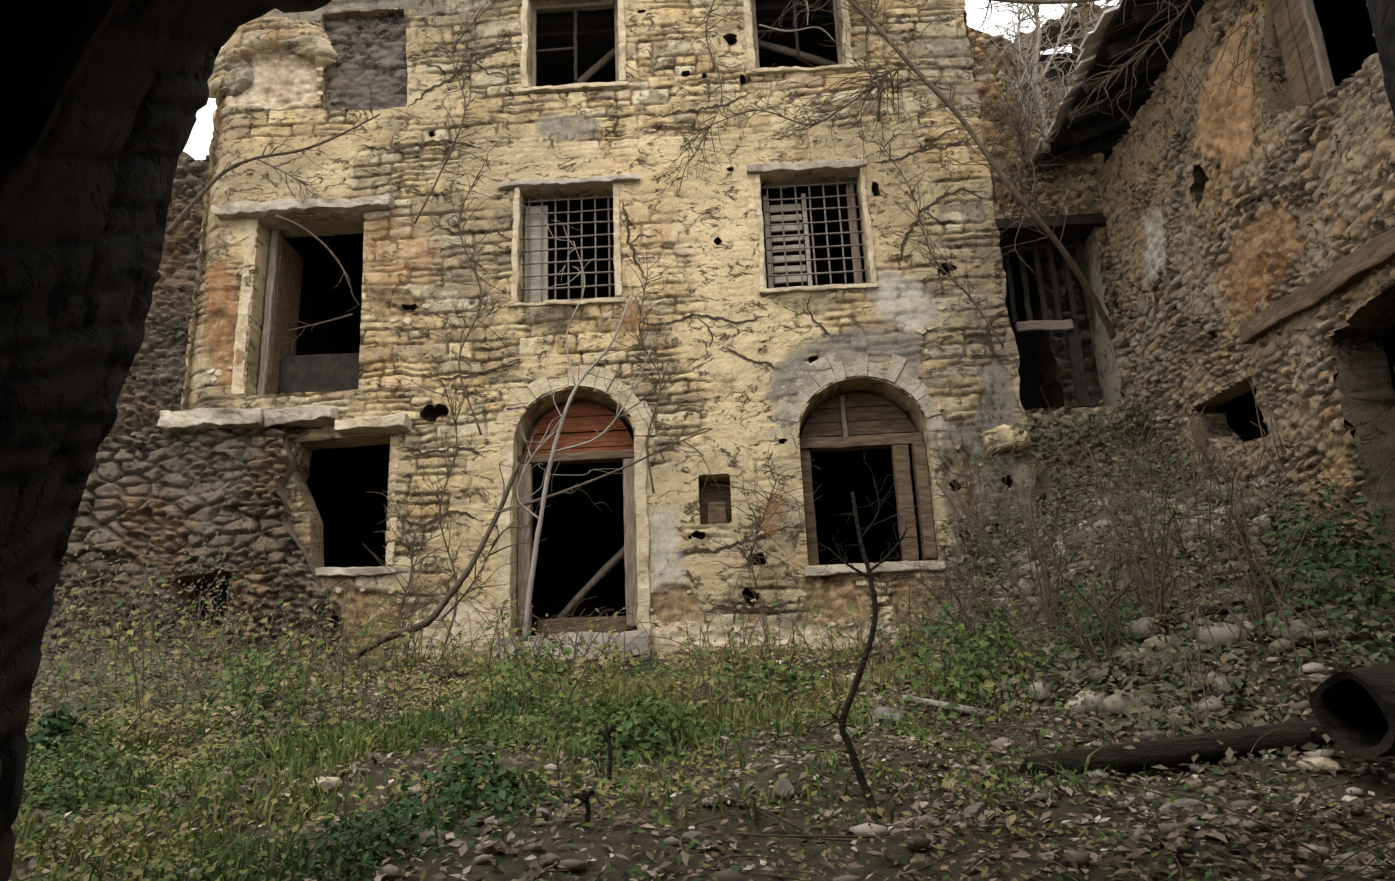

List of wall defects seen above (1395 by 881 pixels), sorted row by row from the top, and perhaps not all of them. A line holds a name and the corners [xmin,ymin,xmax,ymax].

peeling [1194,3,1255,170]
spalling [203,310,236,382]
water stain [771,331,922,398]